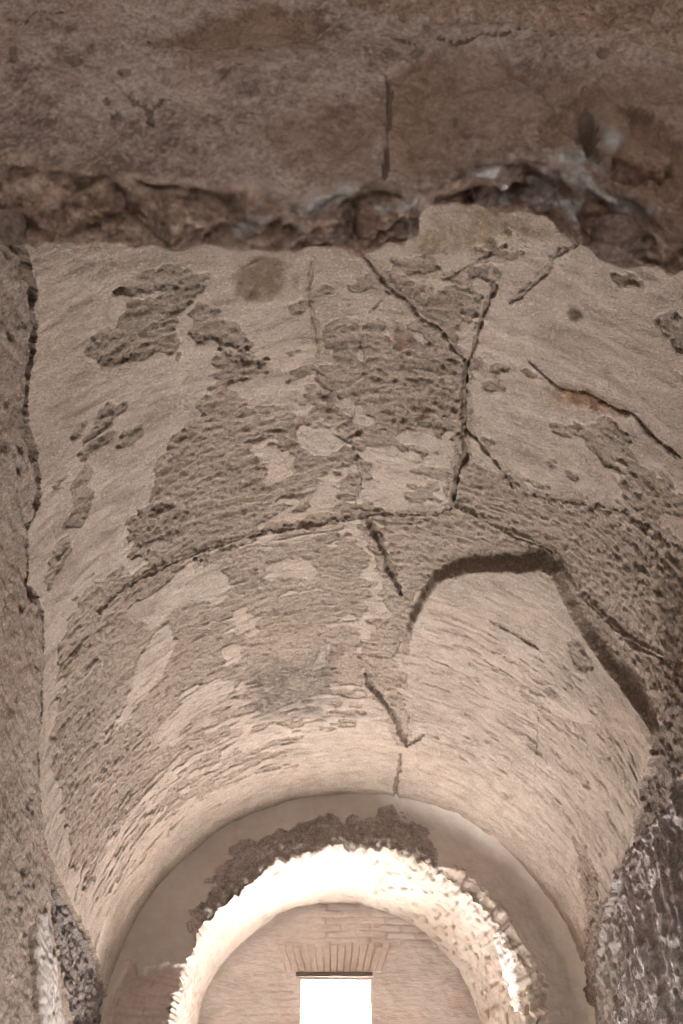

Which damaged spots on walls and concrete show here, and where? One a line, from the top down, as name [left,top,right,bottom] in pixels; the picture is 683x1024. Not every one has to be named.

spalling [0,46,683,277]
crack [381,76,394,181]
damp [239,259,282,300]
crack [10,244,45,807]
flaking render [45,227,683,901]
crack [99,243,683,679]
crack [359,671,425,796]
crack [43,835,105,992]
spalling [186,803,553,1024]
flaking render [572,836,616,1009]